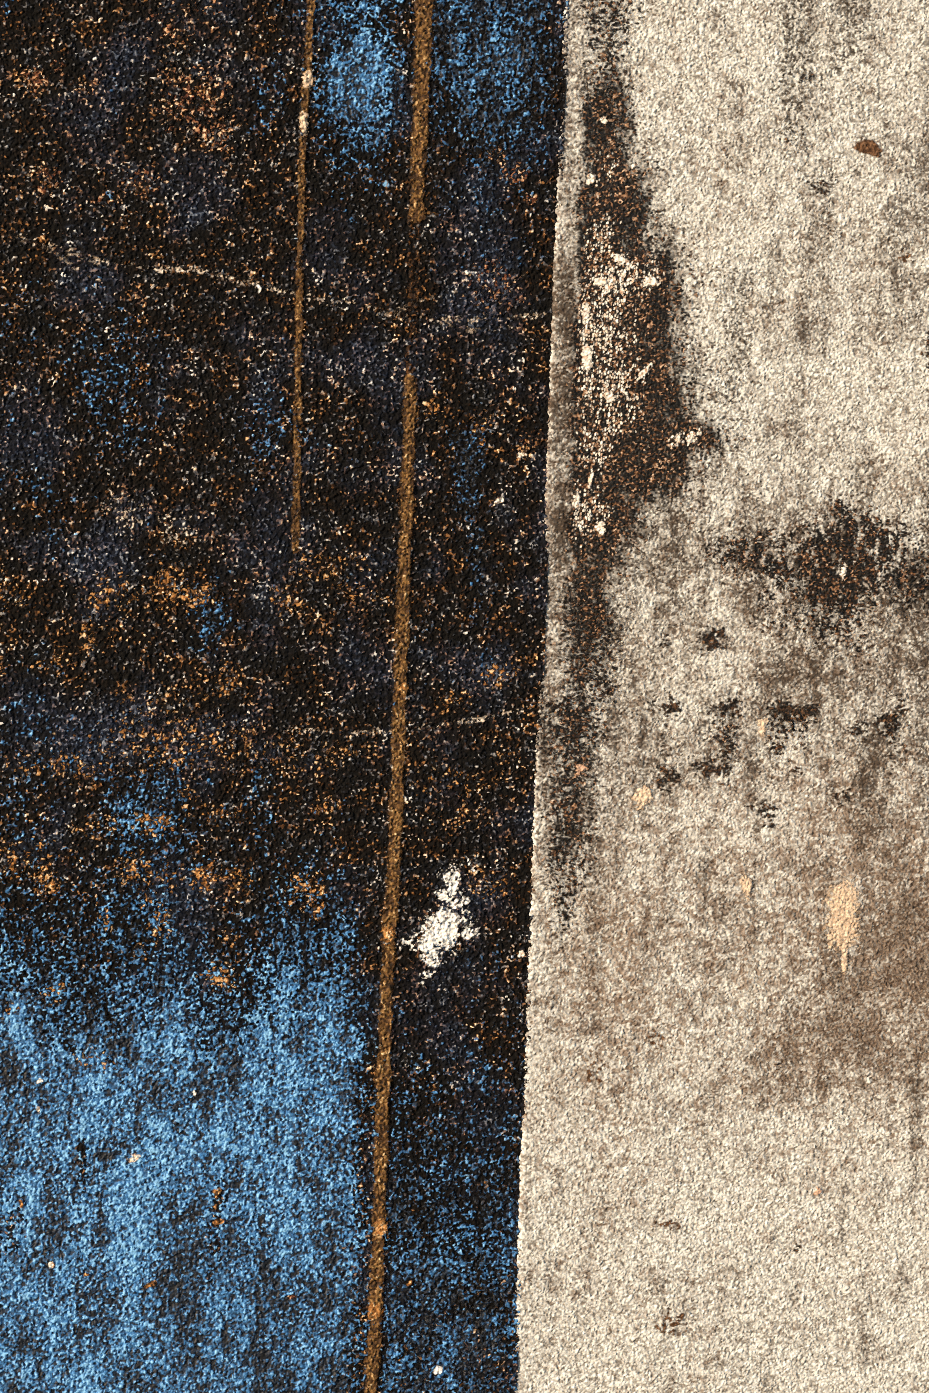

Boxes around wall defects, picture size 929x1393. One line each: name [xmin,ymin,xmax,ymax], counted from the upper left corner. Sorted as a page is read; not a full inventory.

damp [723,263,753,402]
damp [685,492,929,666]
damp [0,0,738,1393]
damp [647,693,820,795]
damp [843,693,914,782]
peeling [402,854,480,984]